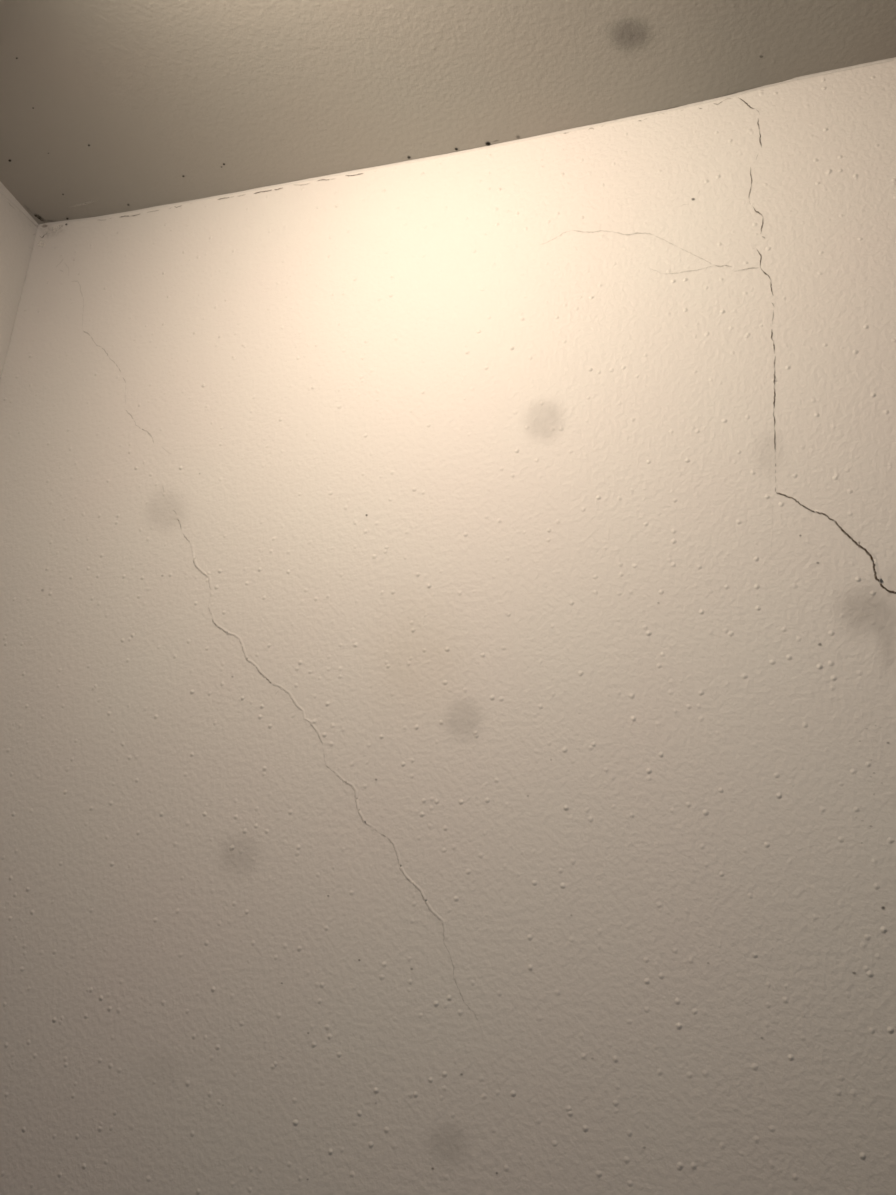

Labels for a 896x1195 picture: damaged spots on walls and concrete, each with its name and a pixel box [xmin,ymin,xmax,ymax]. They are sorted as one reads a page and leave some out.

crack [776,489,896,594]